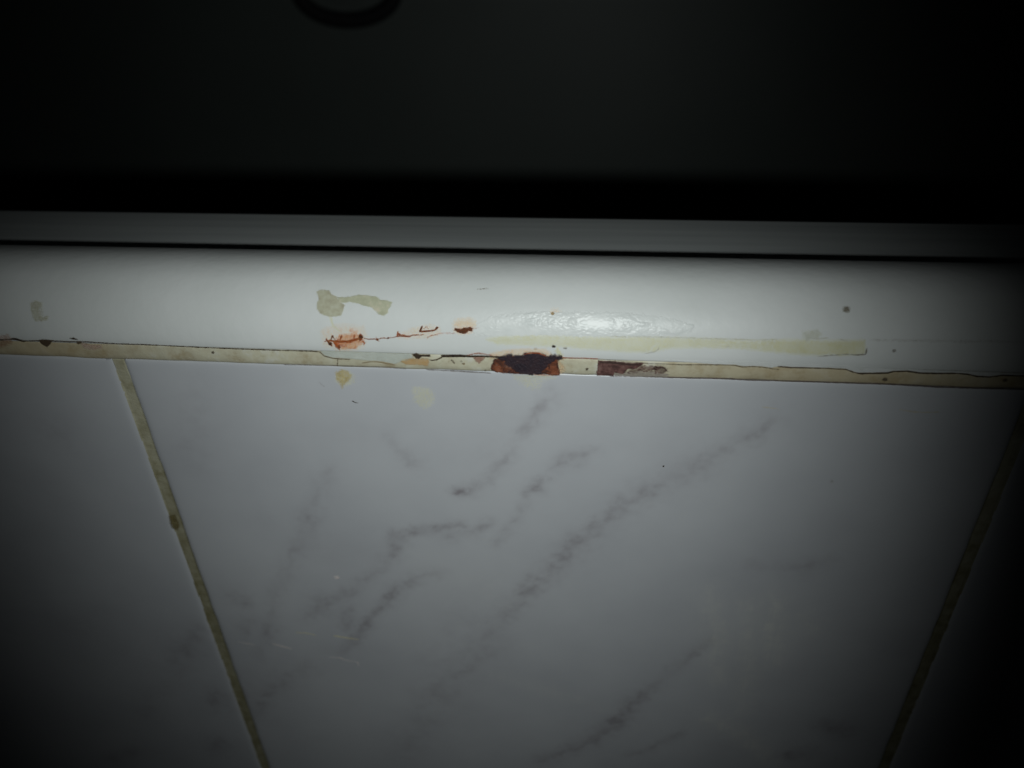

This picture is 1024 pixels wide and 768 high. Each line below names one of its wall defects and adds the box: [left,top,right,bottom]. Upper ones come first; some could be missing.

peeling [316,289,393,332]
corrosion [441,316,477,335]
water stain [486,330,989,357]
corrosion [451,345,668,391]
crack [604,359,1024,390]